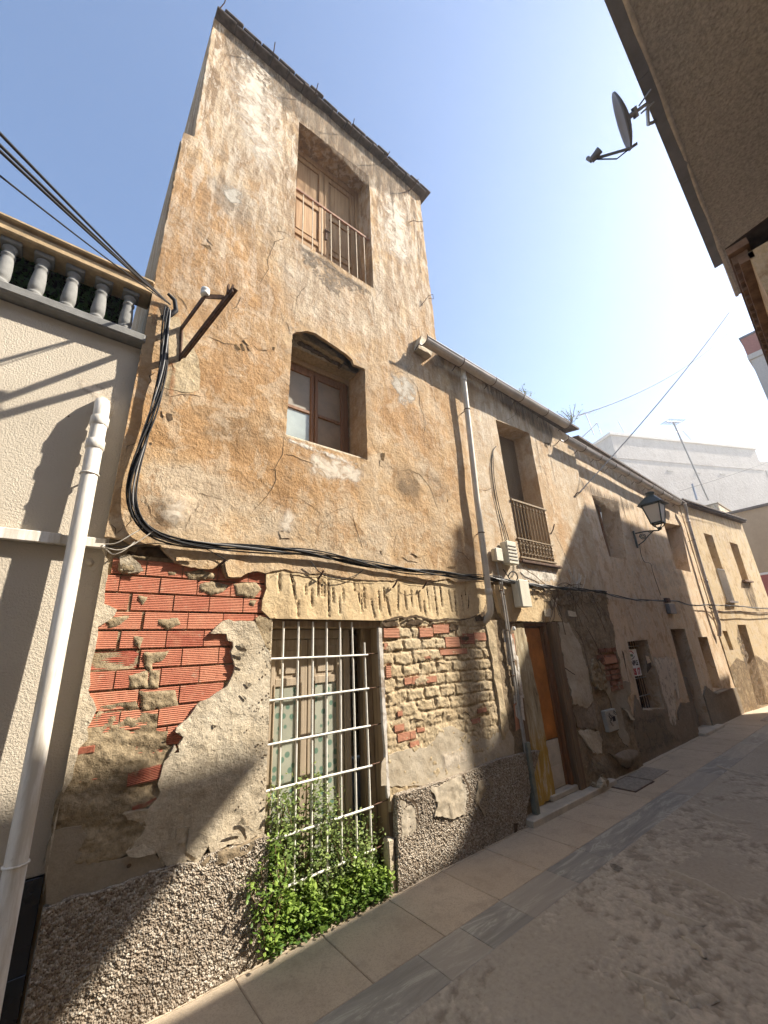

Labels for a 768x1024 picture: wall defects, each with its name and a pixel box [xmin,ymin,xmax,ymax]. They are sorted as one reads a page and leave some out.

crack [248,440,324,517]
spalling [51,547,272,867]
peeling [278,575,525,754]
peeling [577,729,603,755]
spalling [596,647,629,691]